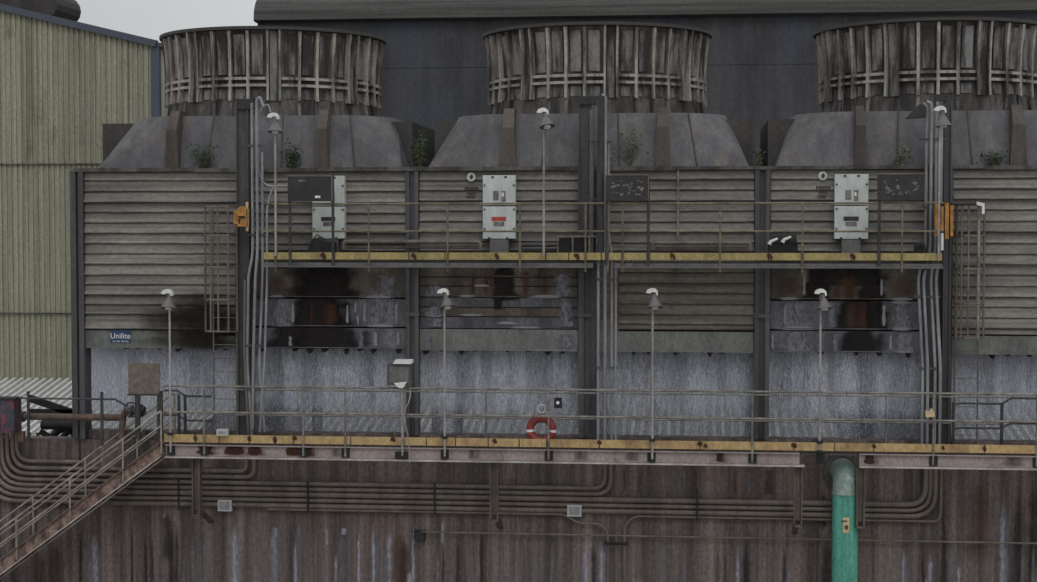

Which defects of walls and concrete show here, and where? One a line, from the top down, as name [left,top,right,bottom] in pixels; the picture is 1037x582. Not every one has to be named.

water stain [267,267,367,349]
water stain [803,268,888,353]
rust [197,446,262,455]
rust [286,447,314,456]
water stain [80,541,98,582]
water stain [315,528,392,582]
water stain [1000,509,1037,582]